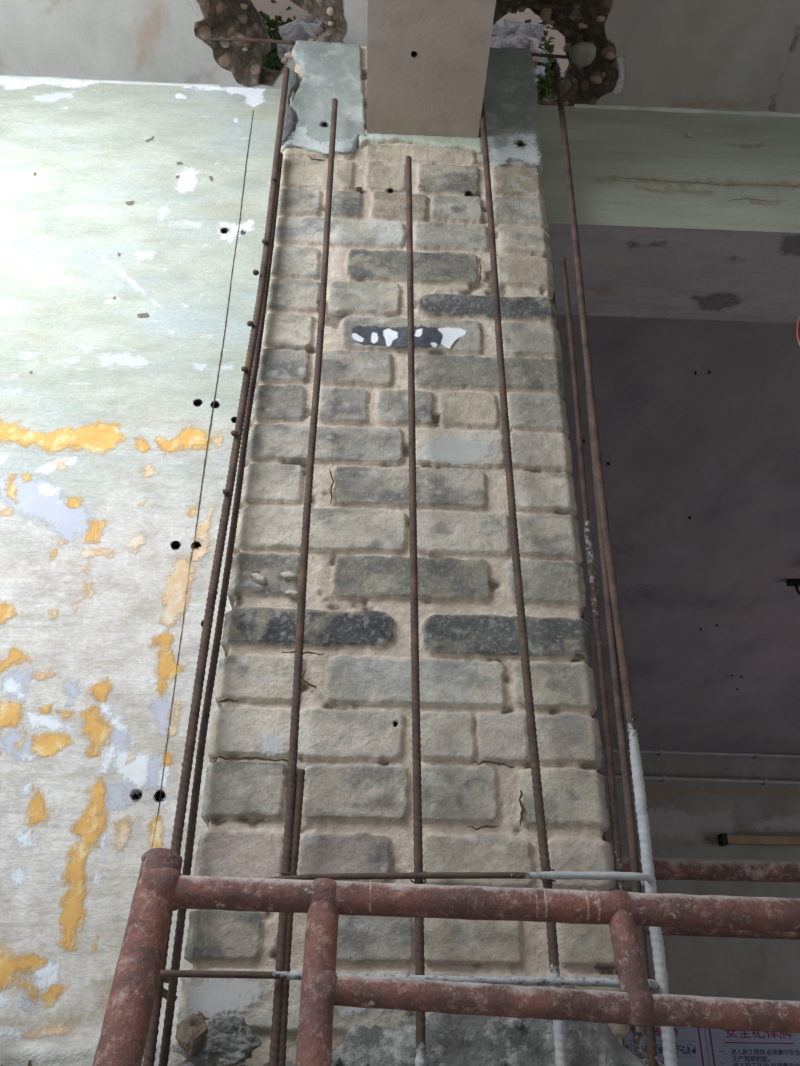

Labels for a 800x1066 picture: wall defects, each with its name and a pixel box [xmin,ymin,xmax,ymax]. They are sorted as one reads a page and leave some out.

spalling [0,0,347,1013]